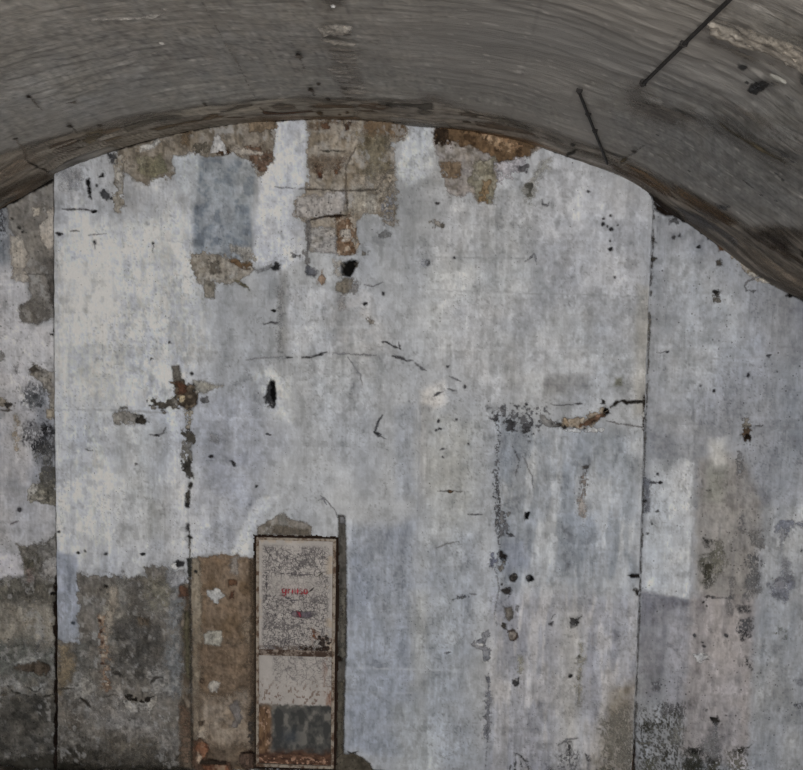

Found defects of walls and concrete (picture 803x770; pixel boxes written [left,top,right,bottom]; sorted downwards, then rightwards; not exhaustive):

peeling [7,121,280,325]
peeling [291,119,408,258]
peeling [433,127,541,204]
spalling [112,406,146,425]
spalling [146,365,223,504]
crack [602,202,716,770]
peeling [0,533,256,770]
damp [549,738,590,770]
damp [596,704,750,770]